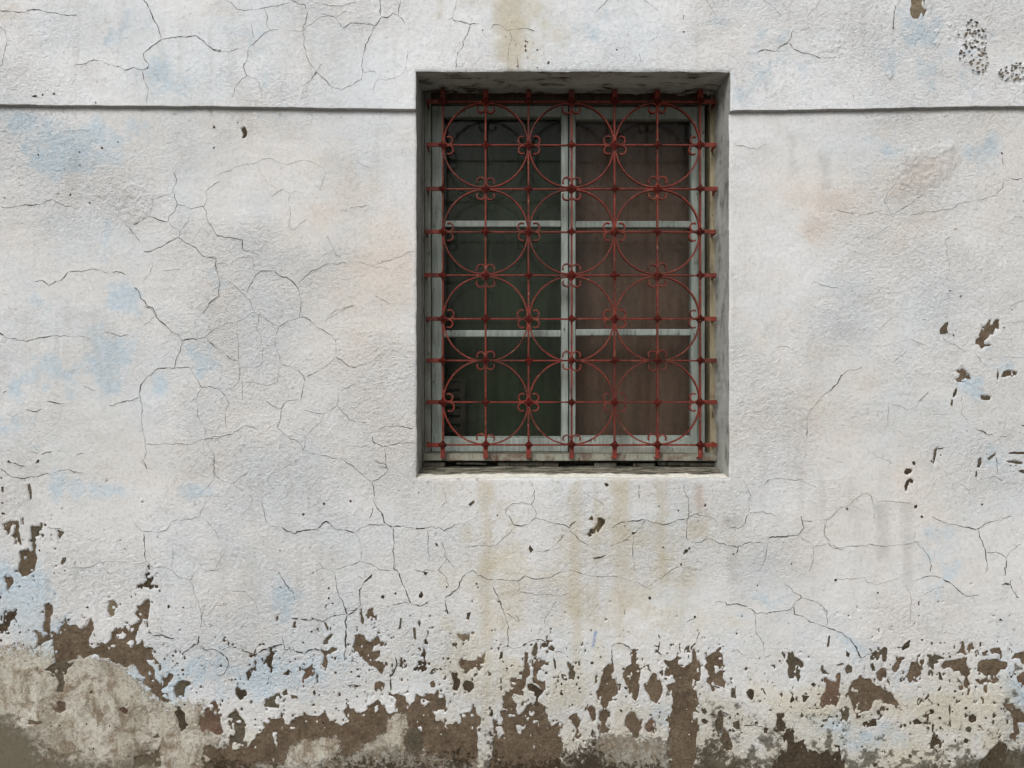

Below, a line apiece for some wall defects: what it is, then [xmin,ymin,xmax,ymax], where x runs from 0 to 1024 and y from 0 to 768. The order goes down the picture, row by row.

peeling [910,0,926,19]
crack [78,0,408,101]
crack [256,158,324,230]
peeling [975,320,1005,349]
peeling [950,369,970,406]
crack [0,169,977,676]
crack [933,516,1022,598]
peeling [0,477,1024,768]
leakage [0,714,159,768]
leakage [307,734,671,768]
leakage [691,715,787,768]
leakage [958,740,1024,768]